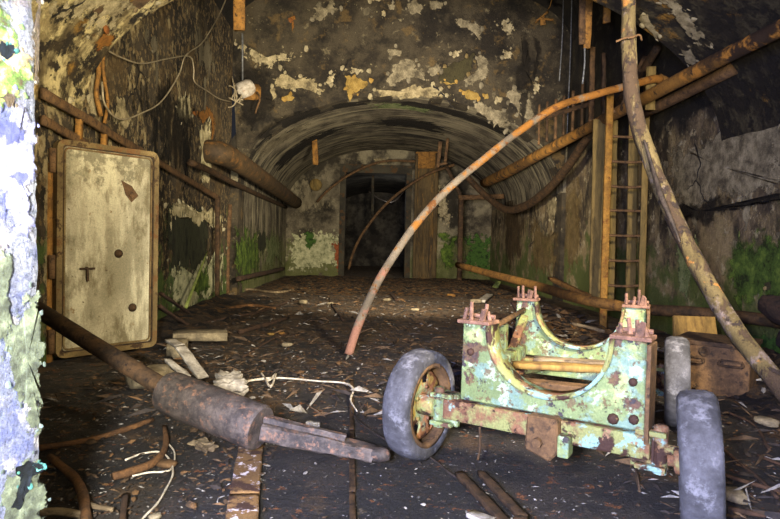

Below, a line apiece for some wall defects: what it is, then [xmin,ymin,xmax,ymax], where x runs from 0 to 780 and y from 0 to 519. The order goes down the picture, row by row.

spalling [310,0,343,22]
spalling [360,0,395,18]
spalling [405,0,447,15]
spalling [455,18,485,40]
spalling [494,18,516,35]
peeling [638,12,662,41]
peeling [656,0,714,67]
peeling [176,91,194,125]
peeling [191,19,215,183]
spalling [234,42,541,135]
peeling [0,0,162,437]
peeling [282,228,339,273]